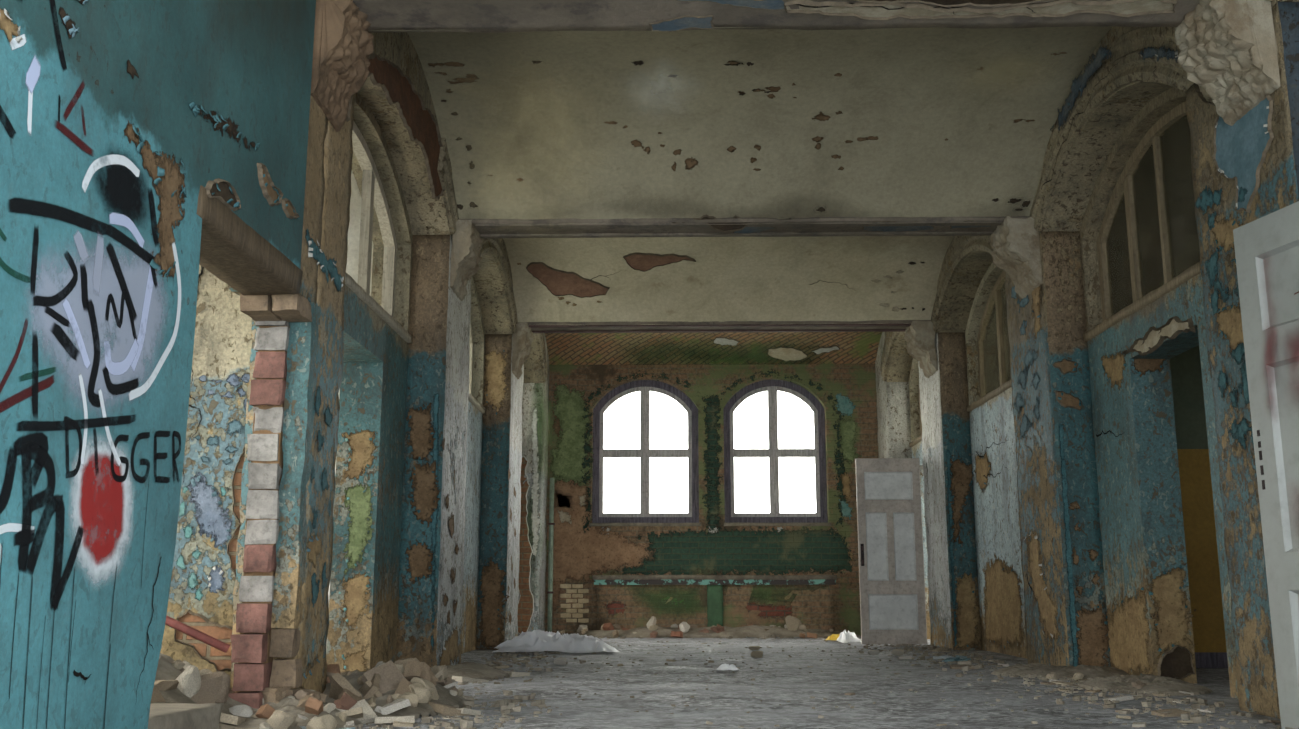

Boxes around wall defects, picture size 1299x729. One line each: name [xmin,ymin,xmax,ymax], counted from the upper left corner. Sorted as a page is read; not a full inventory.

peeling [649,0,1177,32]
flaking render [124,120,187,282]
flaking render [367,54,493,201]
flaking render [517,262,610,306]
peeling [604,121,699,171]
flaking render [623,252,696,272]
flaking render [1101,316,1195,389]
peeling [1194,83,1274,459]
peeling [174,373,250,672]
flaking render [301,386,379,692]
peeling [477,345,856,650]
flaking render [933,424,1196,679]